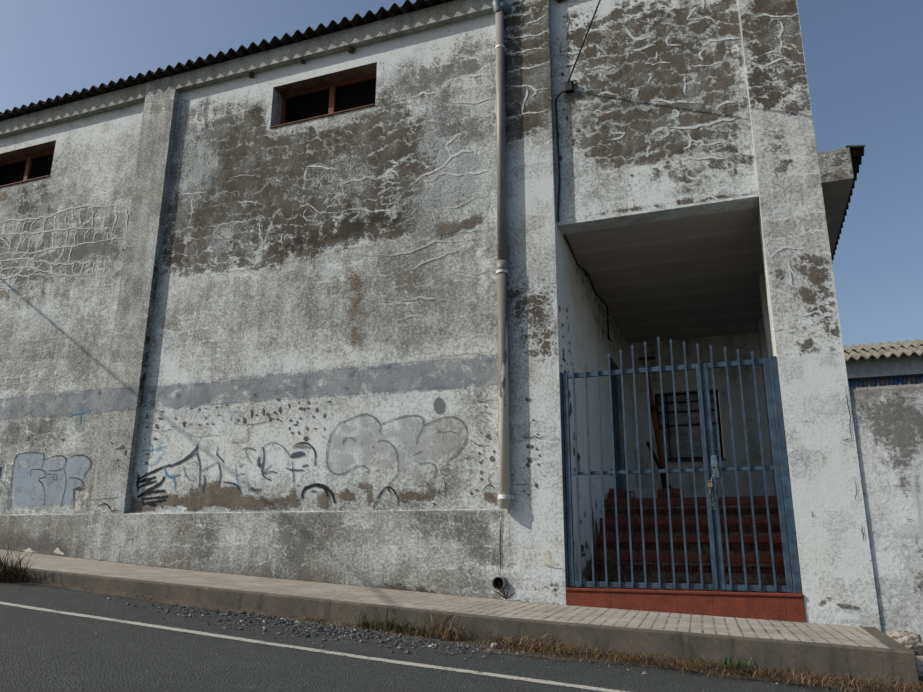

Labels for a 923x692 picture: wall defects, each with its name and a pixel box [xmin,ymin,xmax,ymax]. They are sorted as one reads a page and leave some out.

damp [151,0,810,306]
damp [139,318,150,405]
damp [507,275,557,364]
damp [770,249,840,354]
damp [853,392,923,494]